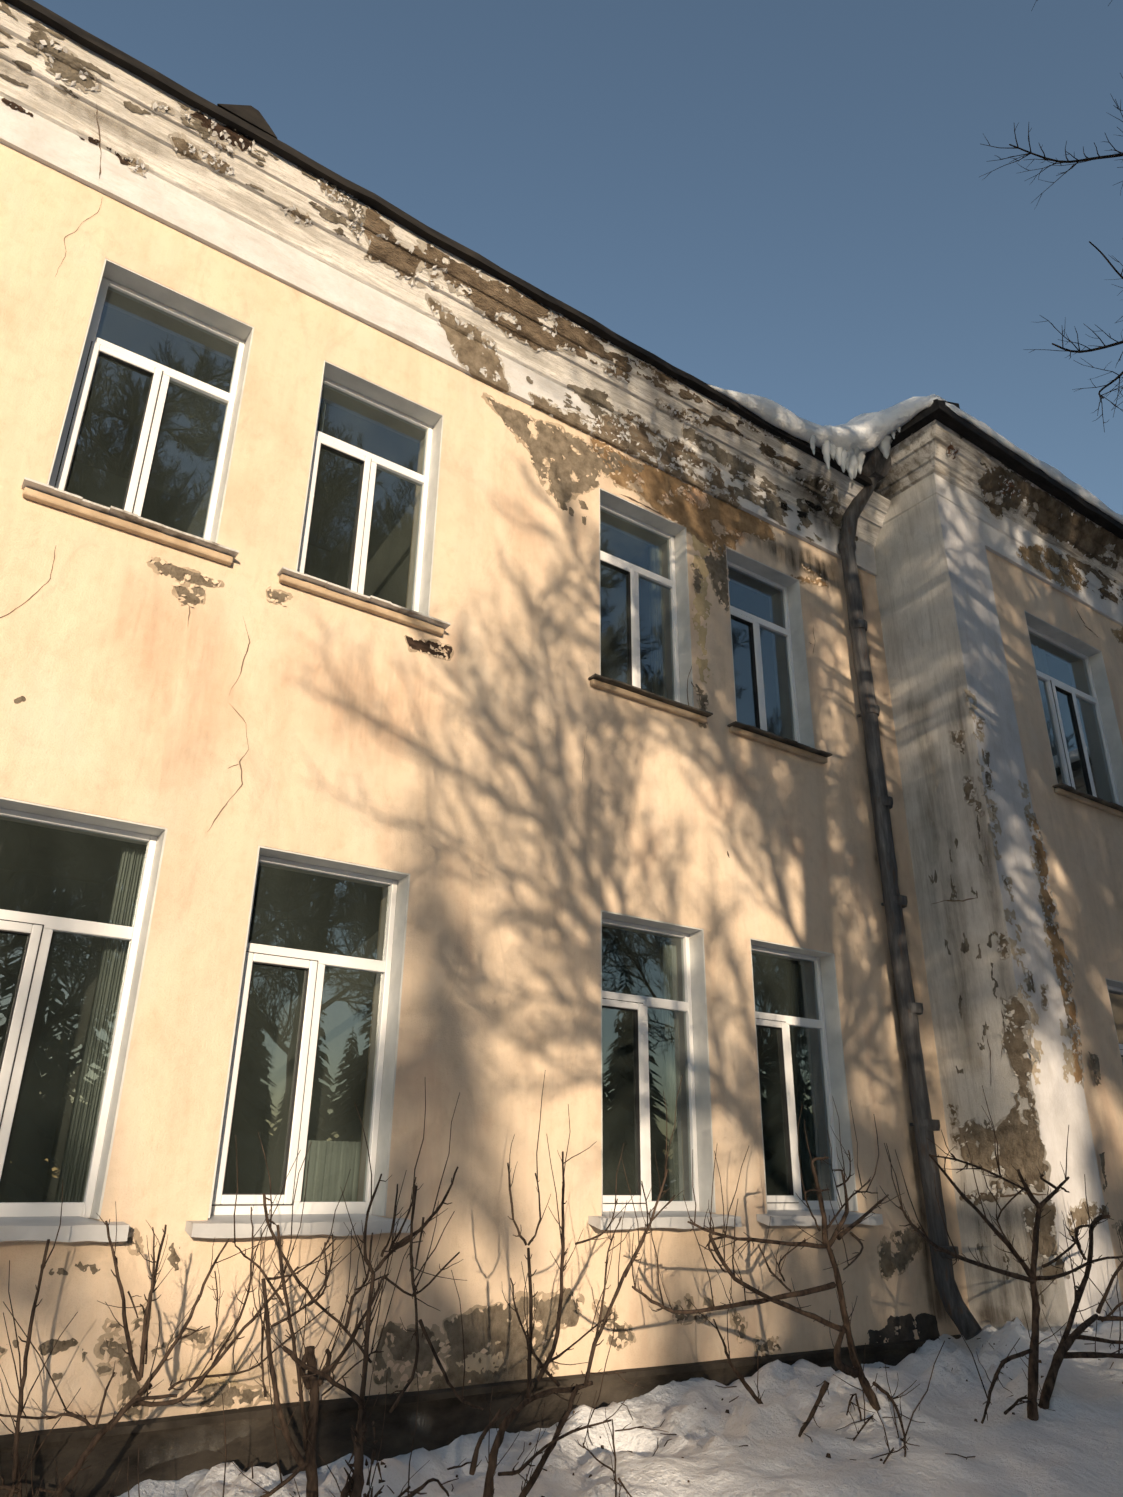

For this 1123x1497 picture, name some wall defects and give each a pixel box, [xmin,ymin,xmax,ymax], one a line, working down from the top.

spalling [0,0,114,117]
crack [57,110,102,272]
spalling [81,137,149,177]
spalling [123,100,279,191]
spalling [278,166,858,729]
spalling [946,434,1123,604]
crack [0,547,56,618]
spalling [145,556,225,607]
crack [208,621,250,831]
spalling [943,688,1123,1307]
spalling [38,1301,238,1420]
spalling [371,1286,636,1394]